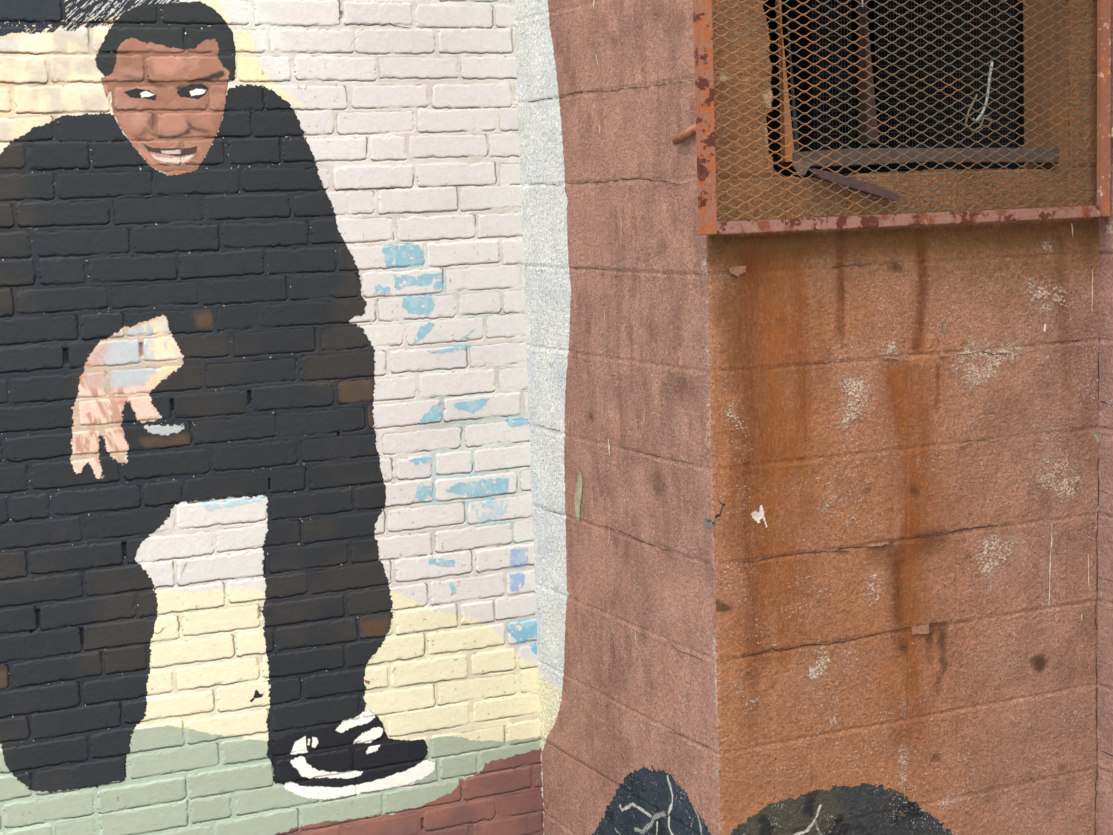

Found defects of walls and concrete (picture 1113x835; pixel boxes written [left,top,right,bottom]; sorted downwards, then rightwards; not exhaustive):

crack [526,80,693,103]
crack [719,524,1011,572]
crack [670,623,945,662]